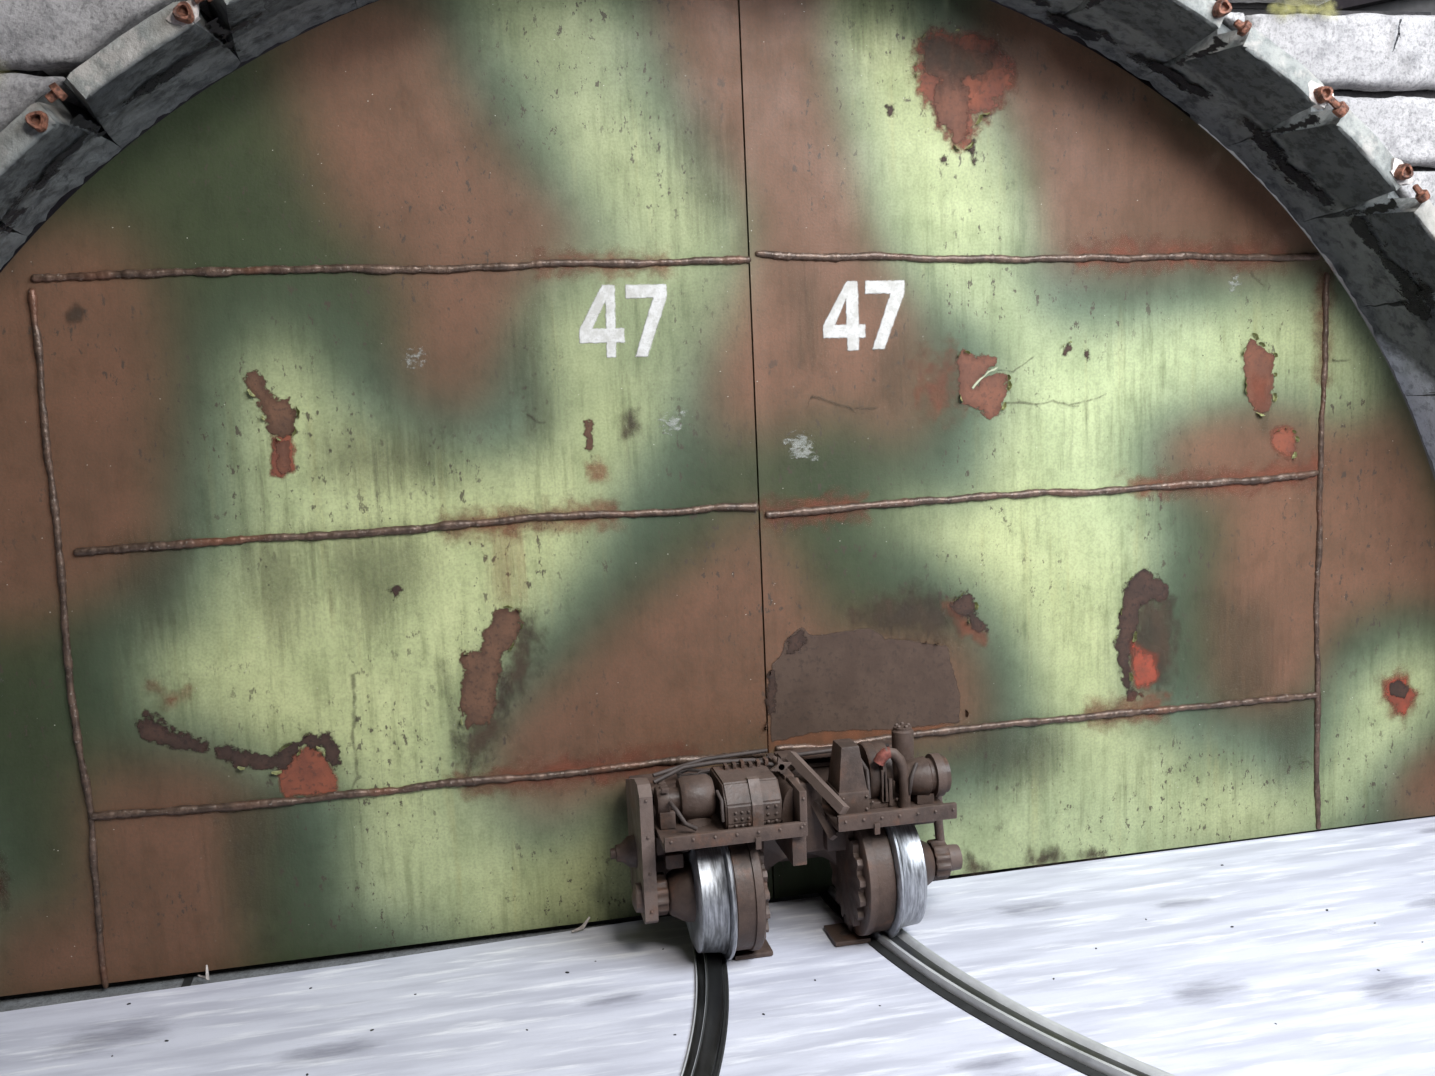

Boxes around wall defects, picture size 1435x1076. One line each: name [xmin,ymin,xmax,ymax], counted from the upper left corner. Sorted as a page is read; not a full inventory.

corrosion [913,27,1017,165]
corrosion [1384,676,1418,715]
corrosion [775,729,890,745]